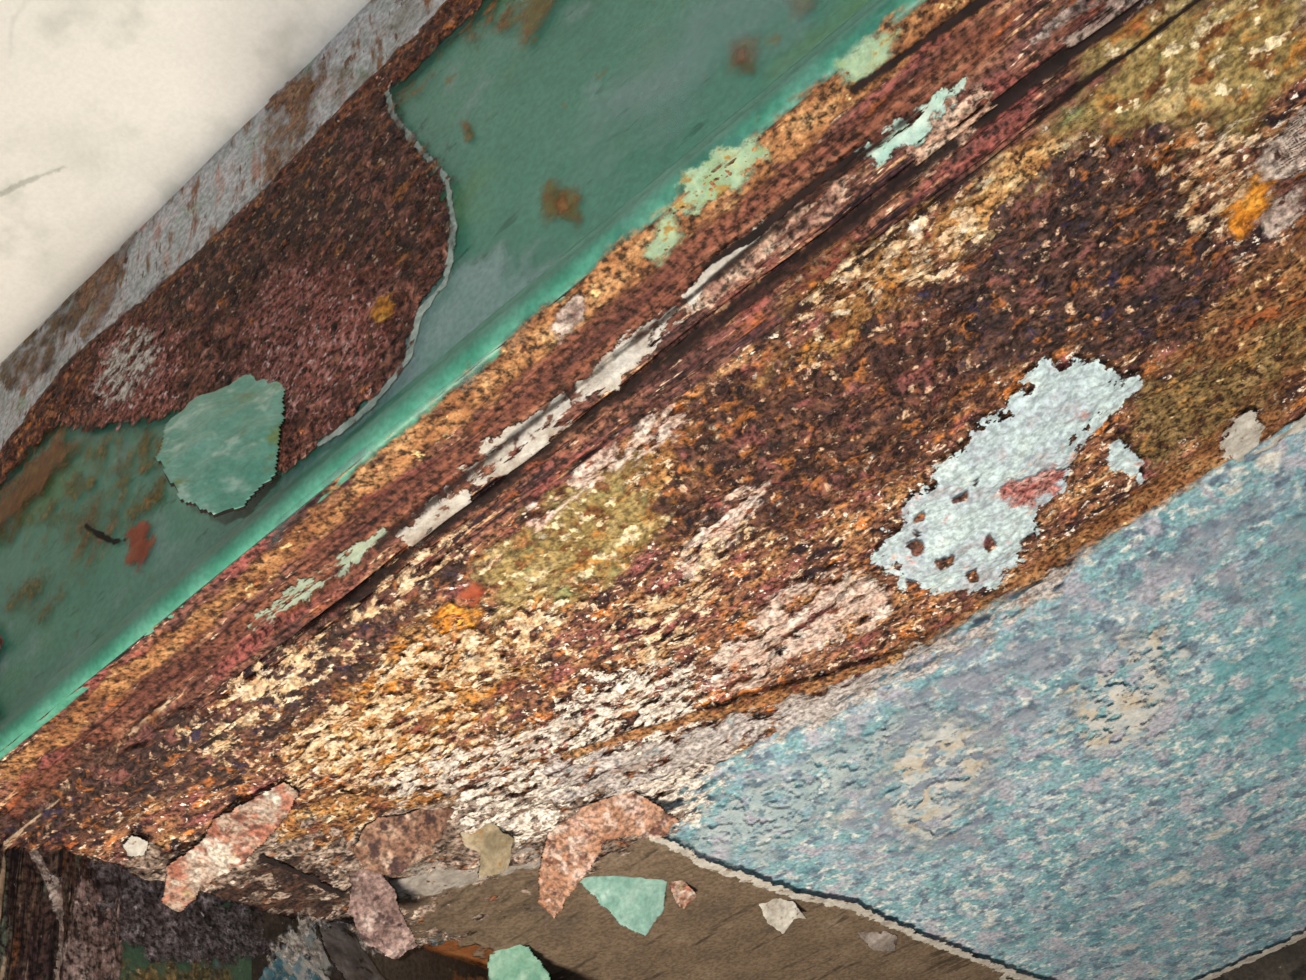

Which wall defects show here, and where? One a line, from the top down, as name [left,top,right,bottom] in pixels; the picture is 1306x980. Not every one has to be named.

rust [0,0,1003,856]
peeling [29,77,1041,980]
crack [279,0,1201,649]
rust [459,0,1306,622]
rust [562,443,1233,759]
spalling [999,469,1066,510]
peeling [1156,122,1287,236]
peeling [1198,931,1306,980]